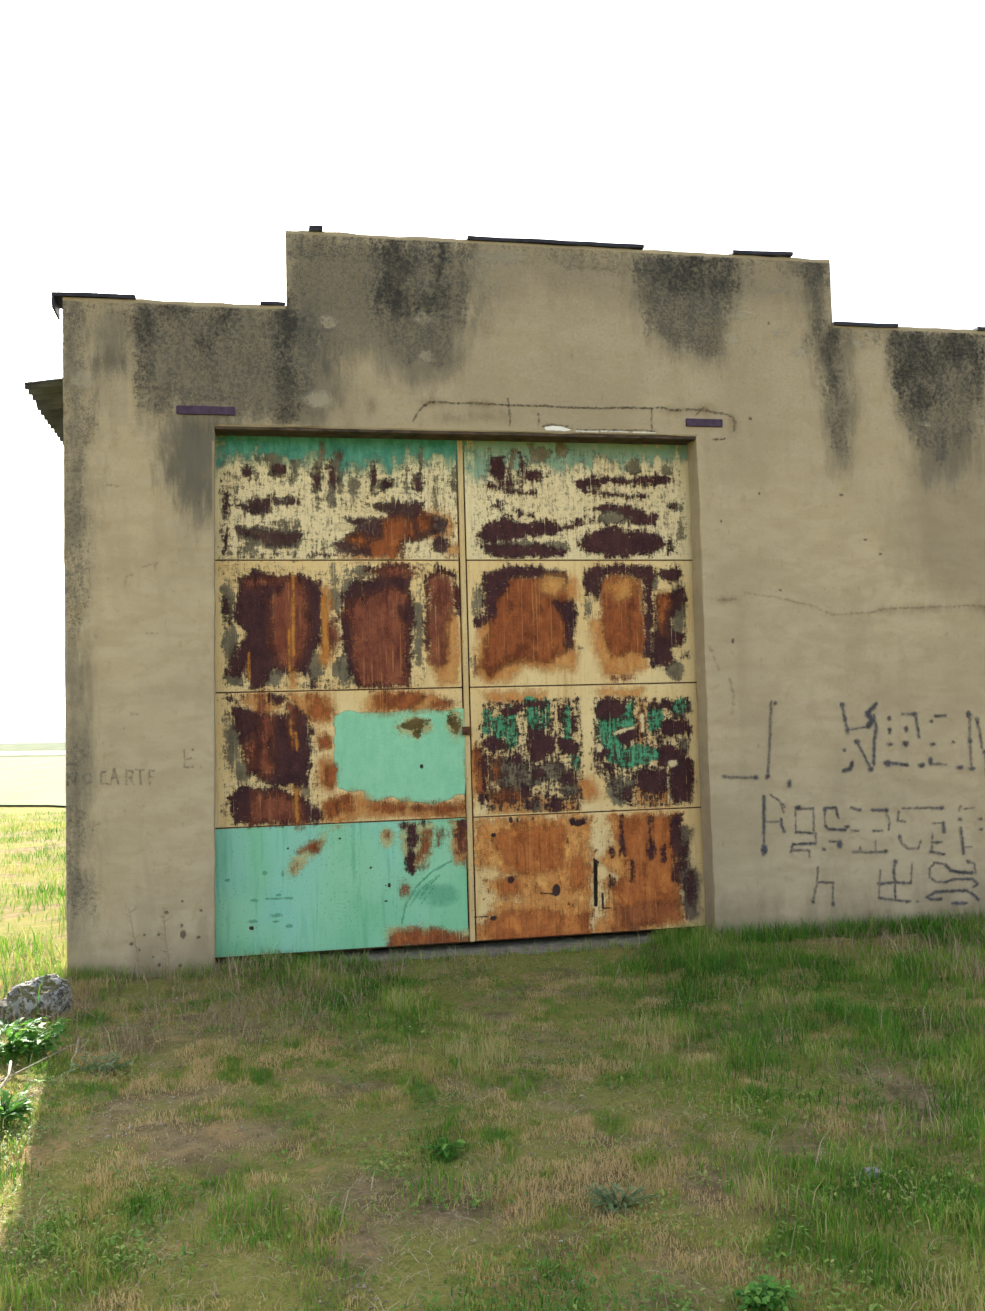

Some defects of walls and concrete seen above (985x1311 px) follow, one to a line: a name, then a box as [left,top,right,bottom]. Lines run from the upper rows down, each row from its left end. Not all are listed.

damp [634,256,738,356]
damp [892,331,985,459]
rust [217,496,687,946]
peeling [219,425,702,920]